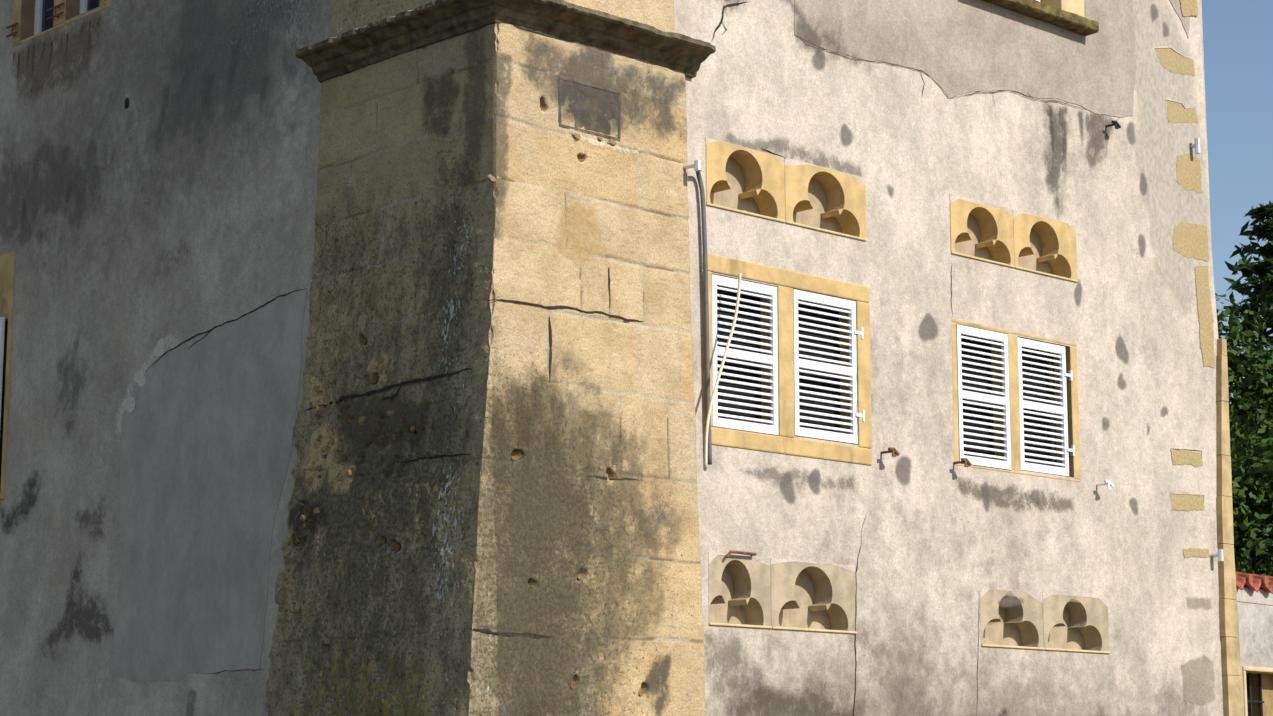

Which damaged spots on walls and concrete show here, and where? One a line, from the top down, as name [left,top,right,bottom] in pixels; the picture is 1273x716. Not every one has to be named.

crack [801,38,1088,109]
leakage [1047,109,1066,208]
leakage [1080,112,1112,165]
crack [145,288,307,372]
leakage [2,474,37,531]
leakage [48,570,112,647]